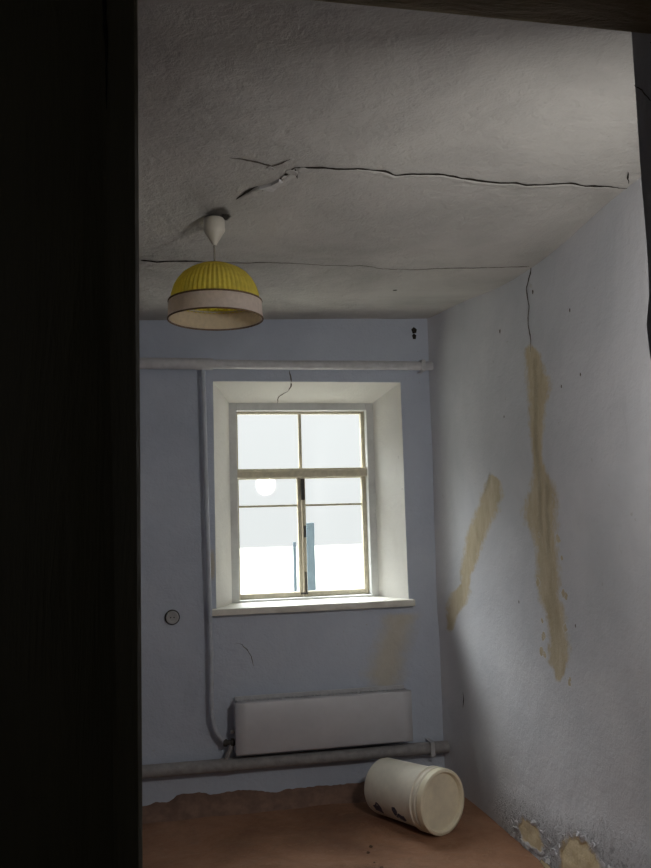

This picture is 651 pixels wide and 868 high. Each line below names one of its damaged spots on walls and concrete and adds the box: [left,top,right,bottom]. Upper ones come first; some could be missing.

crack [233,158,629,202]
crack [470,266,533,352]
leakage [442,473,507,633]
leakage [517,342,575,687]
flaking render [510,812,612,868]